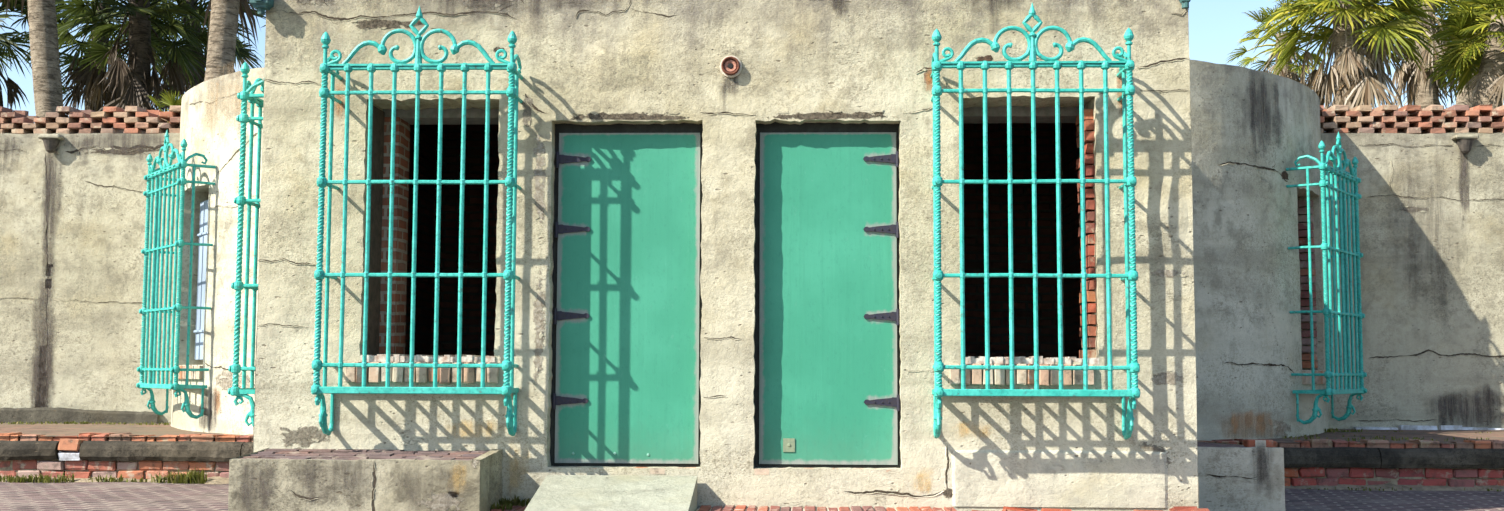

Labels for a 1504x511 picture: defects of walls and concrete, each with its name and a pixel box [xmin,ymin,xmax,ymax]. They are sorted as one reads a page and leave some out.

crack [267,0,525,24]
crack [575,0,675,18]
damp [1460,154,1468,209]
damp [45,159,59,249]
crack [1369,349,1504,359]
crack [1223,362,1296,378]
damp [1436,388,1504,427]